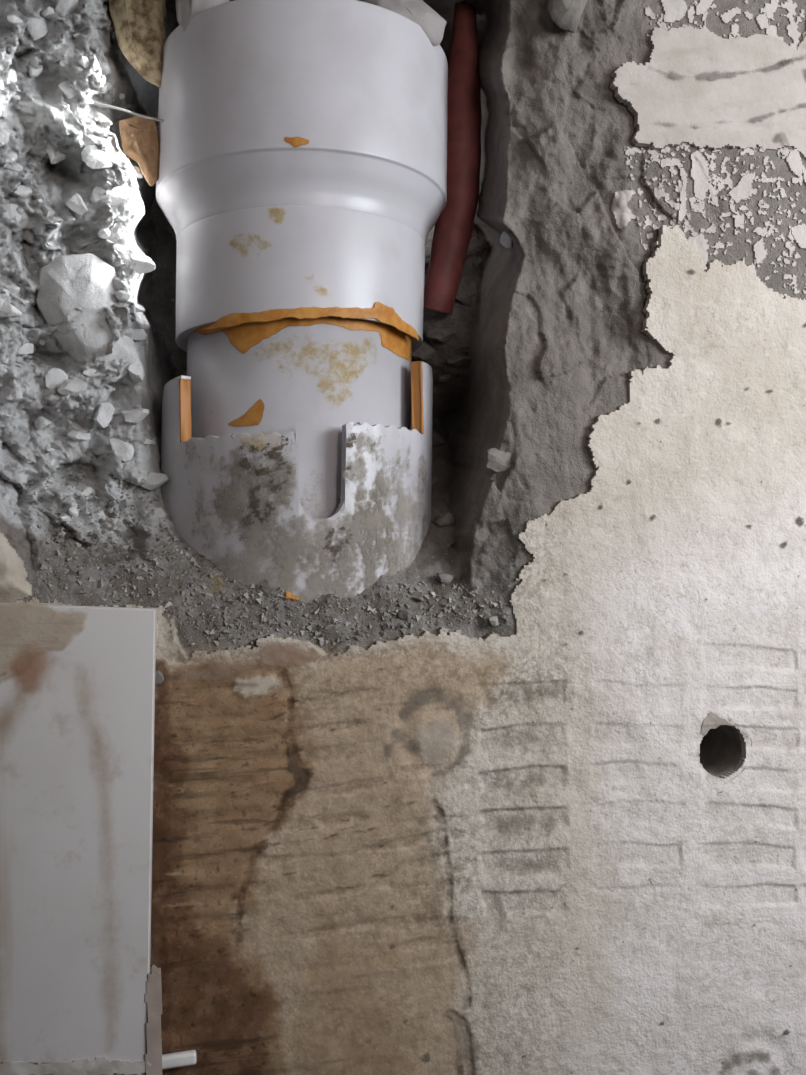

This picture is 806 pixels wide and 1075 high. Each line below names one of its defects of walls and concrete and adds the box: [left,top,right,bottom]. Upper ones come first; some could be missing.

spalling [0,0,806,697]
water stain [152,663,301,1075]